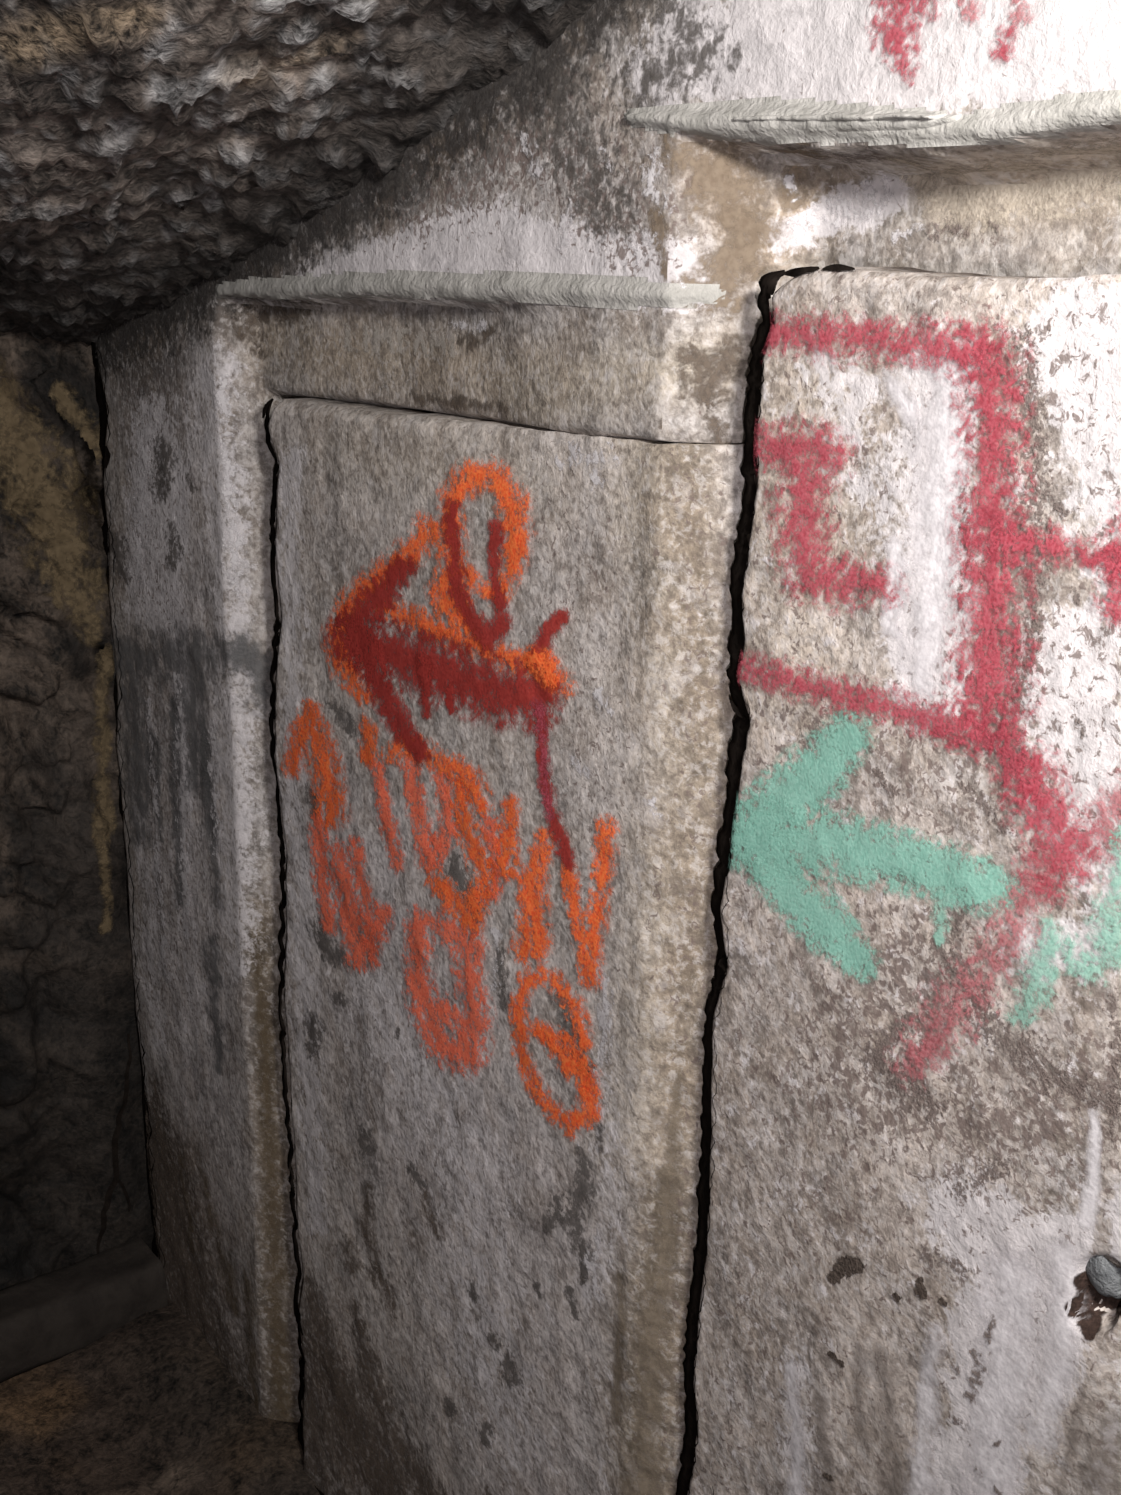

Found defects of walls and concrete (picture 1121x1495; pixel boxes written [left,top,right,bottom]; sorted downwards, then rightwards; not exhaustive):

crack [262,398,324,1495]
crack [676,264,855,1495]
damp [1079,1110,1102,1229]
damp [785,1361,804,1495]
damp [890,1325,940,1495]
damp [970,1245,1077,1495]